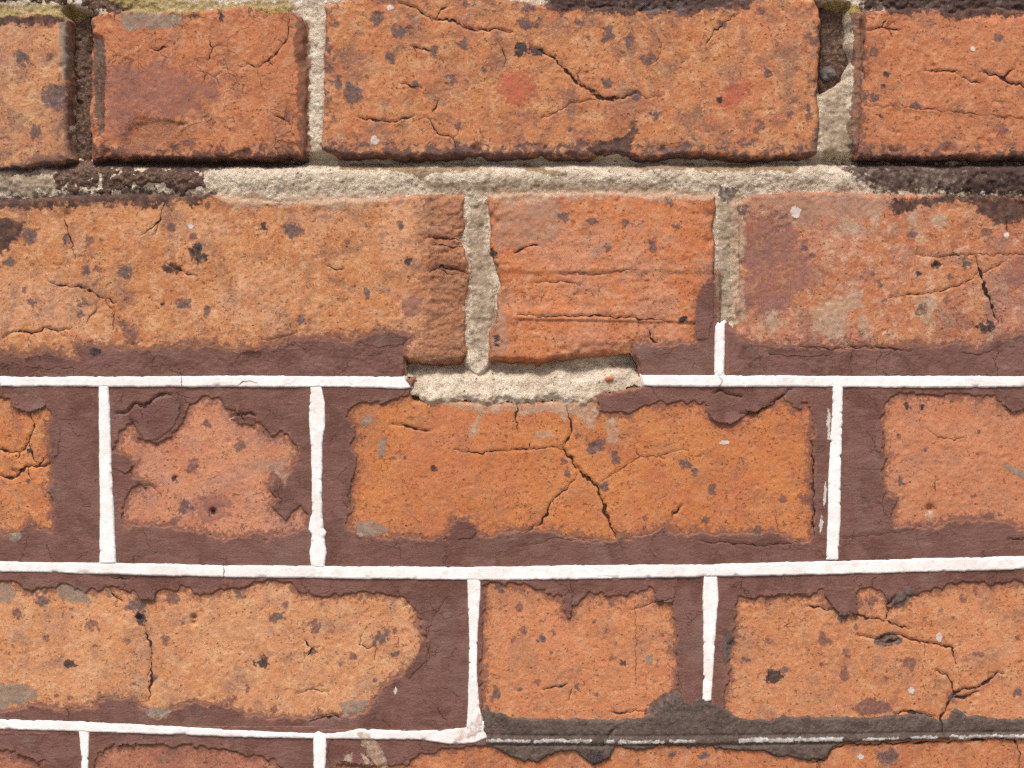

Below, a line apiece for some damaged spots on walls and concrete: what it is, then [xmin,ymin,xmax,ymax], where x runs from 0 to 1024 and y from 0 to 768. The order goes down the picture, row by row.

crack [400,3,513,69]
crack [532,47,660,118]
crack [3,282,117,338]
crack [890,219,1024,322]
peeling [112,396,309,542]
crack [454,406,690,547]
peeling [342,393,814,543]
peeling [874,392,1024,530]
peeling [0,579,430,719]
peeling [479,582,680,720]
peeling [724,579,1024,721]
crack [810,595,1021,768]